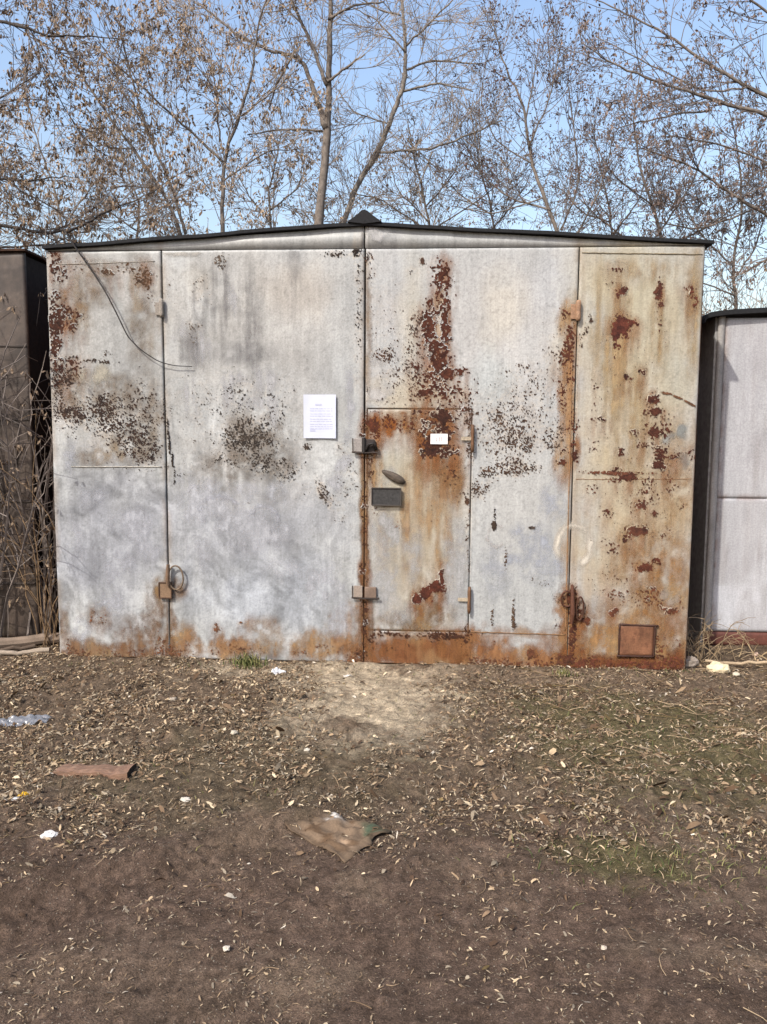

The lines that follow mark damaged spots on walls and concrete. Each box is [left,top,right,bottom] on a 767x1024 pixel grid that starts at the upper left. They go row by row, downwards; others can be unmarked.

corrosion [47,249,695,670]
corrosion [684,267,699,361]